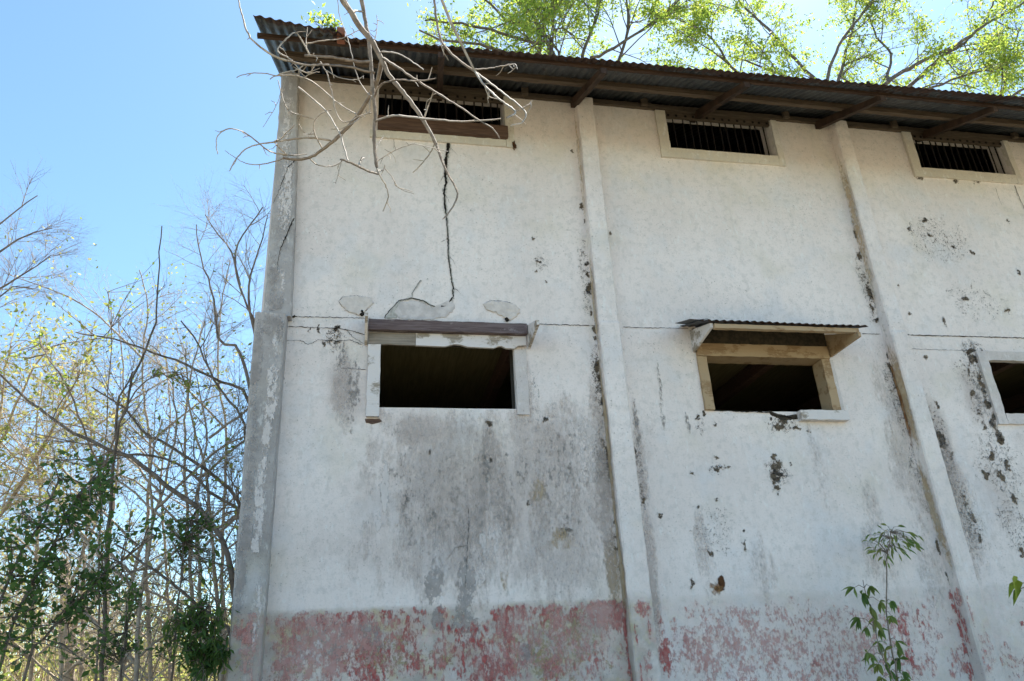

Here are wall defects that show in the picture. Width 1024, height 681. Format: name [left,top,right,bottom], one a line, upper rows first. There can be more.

peeling [278,89,294,230]
water stain [308,324,360,433]
crack [384,143,459,318]
water stain [577,203,610,481]
mould [855,251,879,325]
mould [904,215,975,263]
mould [942,281,1010,327]
peeling [233,259,938,681]
water stain [953,342,1024,558]
peeling [949,588,1024,681]